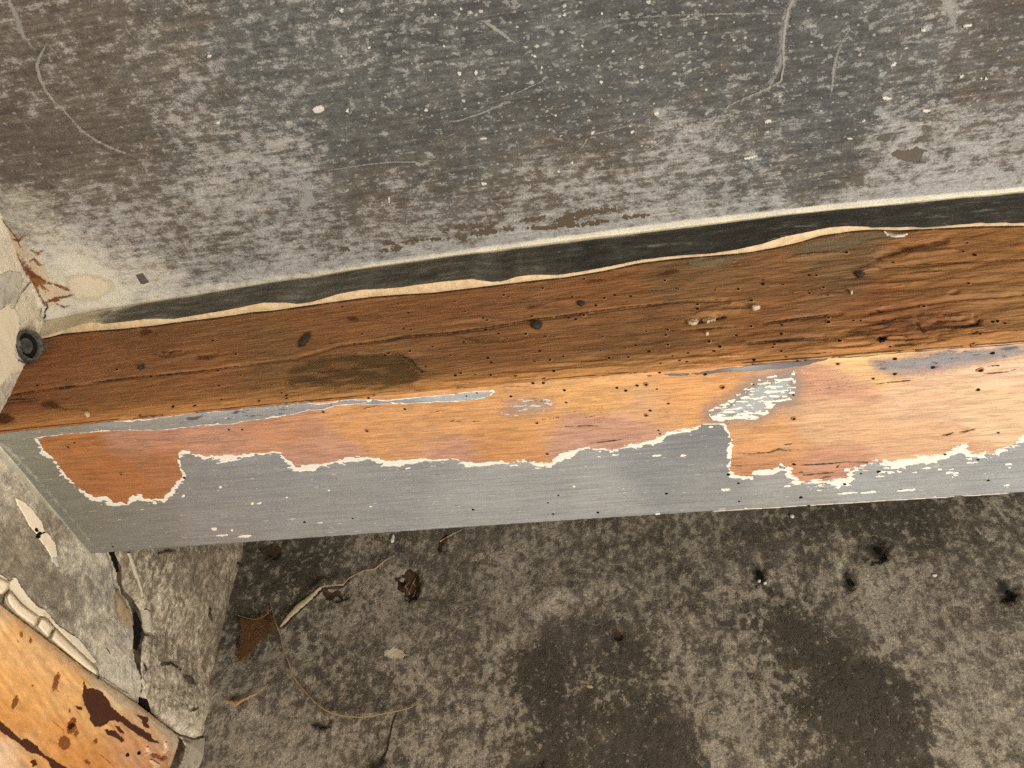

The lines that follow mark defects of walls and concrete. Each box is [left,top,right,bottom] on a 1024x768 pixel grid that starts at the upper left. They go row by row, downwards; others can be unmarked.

corrosion [6,227,72,312]
peeling [873,346,1024,374]
peeling [0,359,1024,567]
crack [2,552,145,693]
leakage [717,614,916,763]